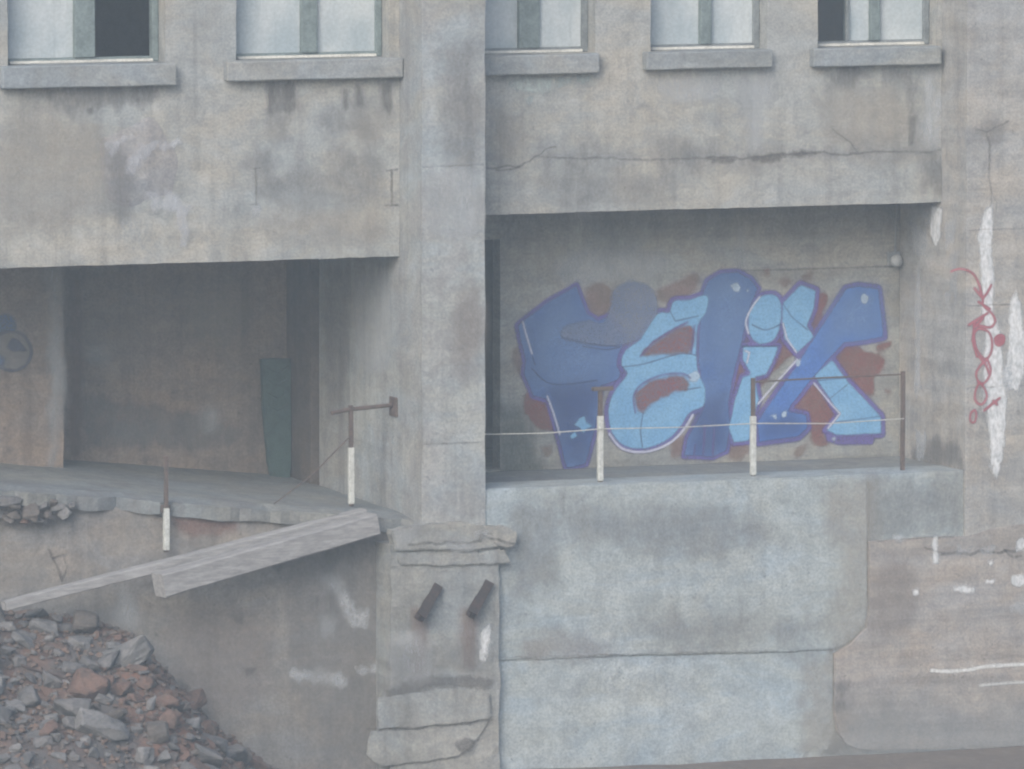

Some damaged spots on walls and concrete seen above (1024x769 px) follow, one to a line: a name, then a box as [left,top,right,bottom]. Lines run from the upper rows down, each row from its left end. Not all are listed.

spalling [366,677,492,766]